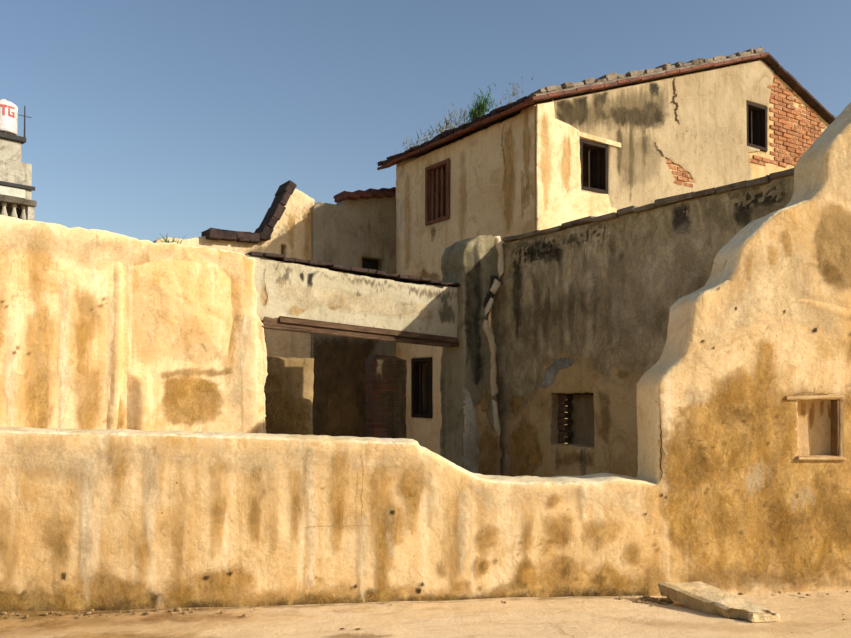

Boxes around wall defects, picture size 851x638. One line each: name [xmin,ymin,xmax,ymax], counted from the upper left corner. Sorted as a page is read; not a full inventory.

damp [557,83,664,183]
crack [671,77,680,125]
flaking render [665,159,696,188]
flaking render [749,74,826,167]
damp [816,205,851,289]
damp [481,176,794,415]
damp [163,368,231,424]
damp [477,432,497,475]
damp [509,419,541,477]
damp [662,341,851,587]
damp [0,457,149,611]
damp [165,518,427,608]